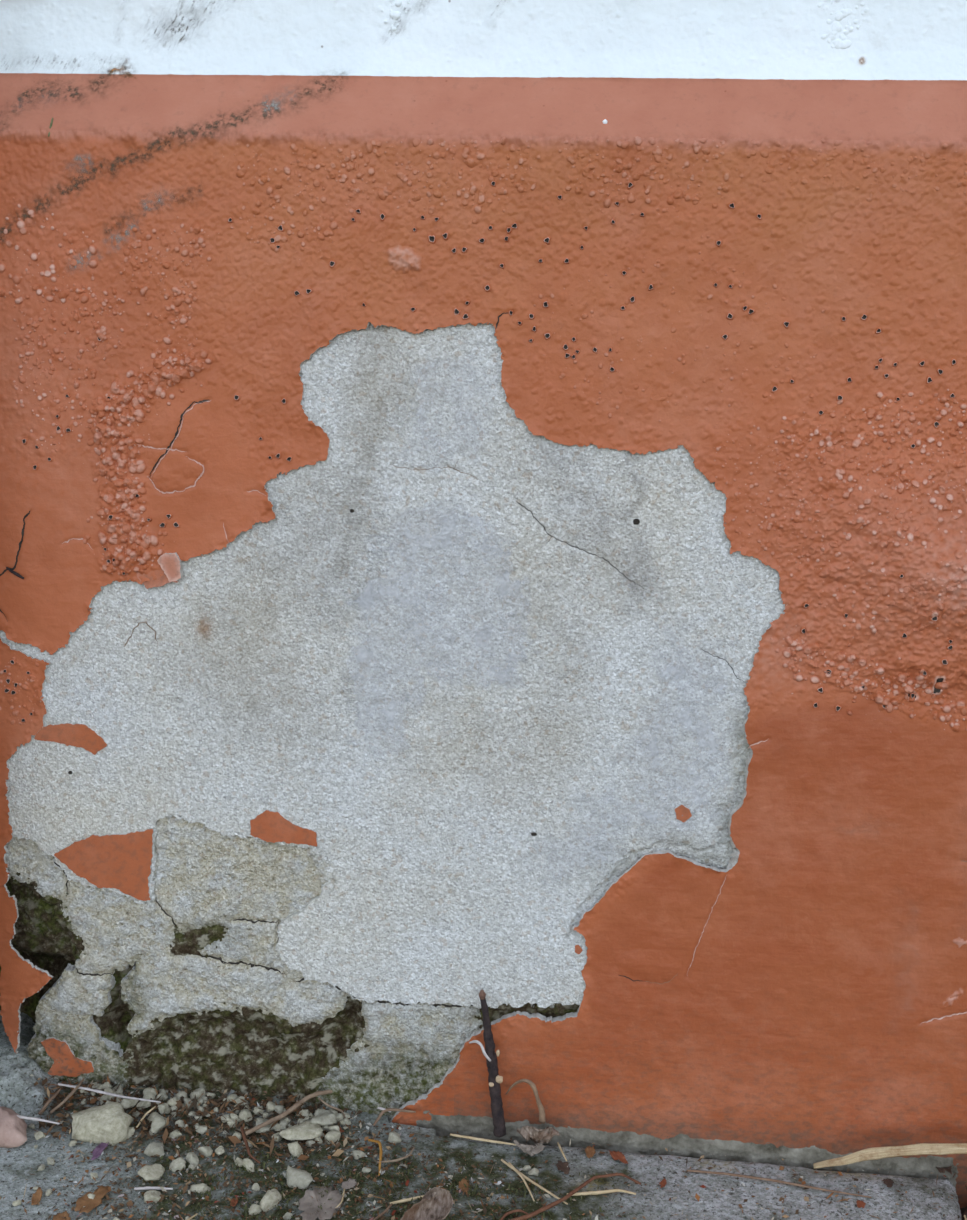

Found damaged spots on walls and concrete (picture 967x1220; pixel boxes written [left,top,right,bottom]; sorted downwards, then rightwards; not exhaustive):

crack [142,400,210,494]
crack [0,511,30,576]
peeling [0,323,785,1122]
crack [619,875,727,984]
crack [922,1012,967,1023]